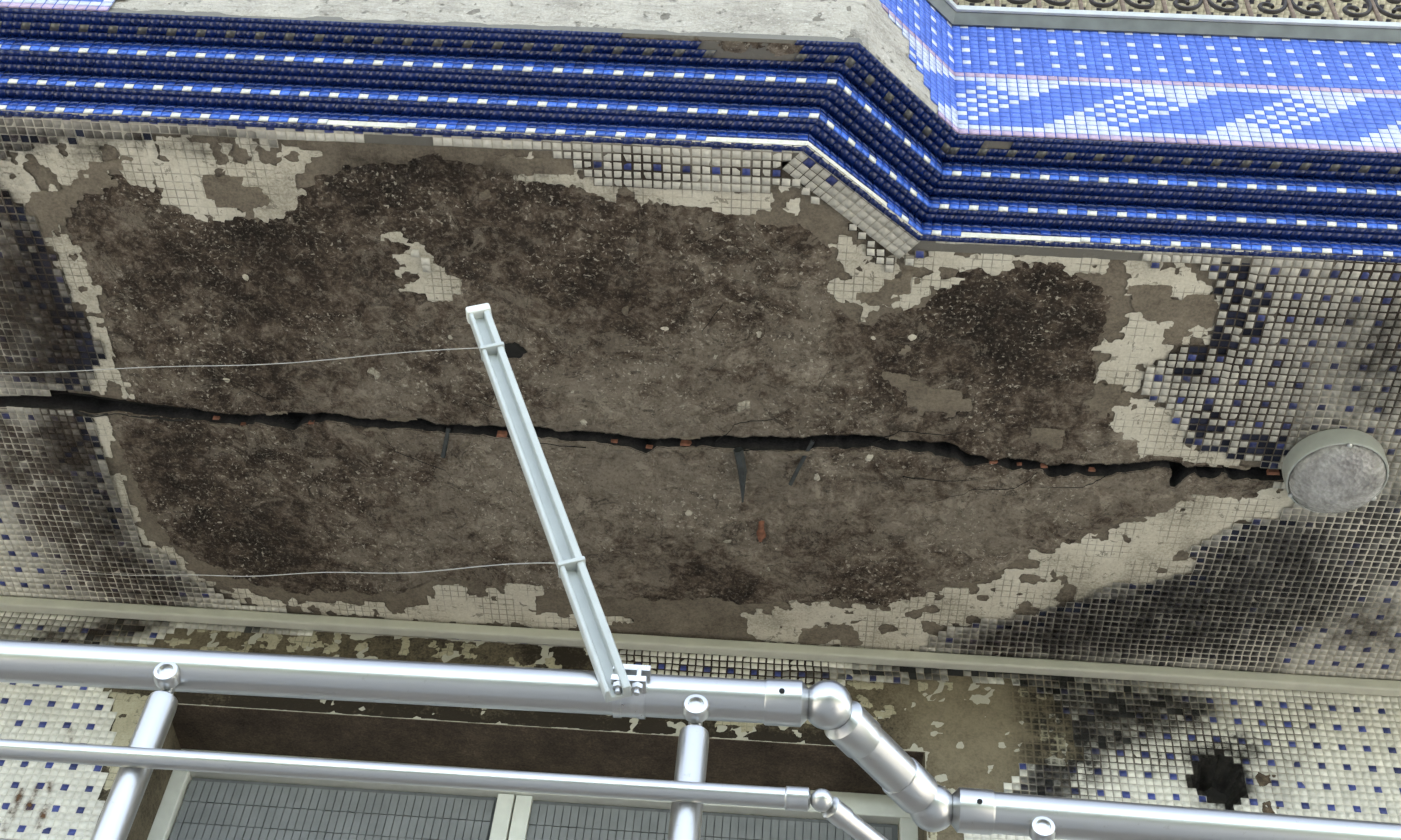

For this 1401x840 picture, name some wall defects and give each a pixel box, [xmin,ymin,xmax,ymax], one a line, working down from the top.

spalling [110,0,938,114]
crack [0,379,1284,505]
spalling [0,120,1297,671]
water stain [964,536,1396,658]
spalling [96,766,120,825]
spalling [103,688,154,747]
spalling [126,769,173,840]
spalling [162,692,887,795]
spalling [918,825,964,840]
spalling [844,672,1084,792]
water stain [1013,676,1205,796]
water stain [1184,735,1262,809]